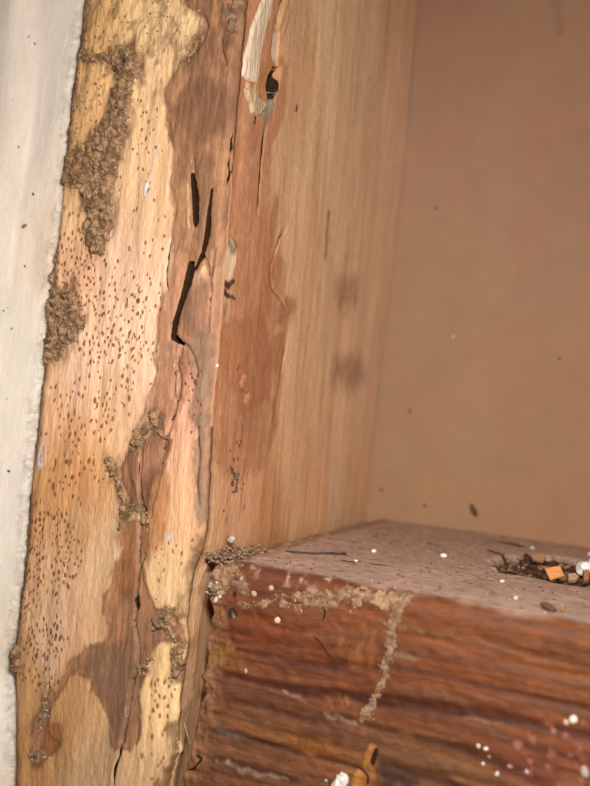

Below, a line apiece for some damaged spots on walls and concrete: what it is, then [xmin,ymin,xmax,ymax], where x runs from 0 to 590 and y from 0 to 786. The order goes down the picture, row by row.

crack [206,251,216,318]
crack [114,678,136,781]